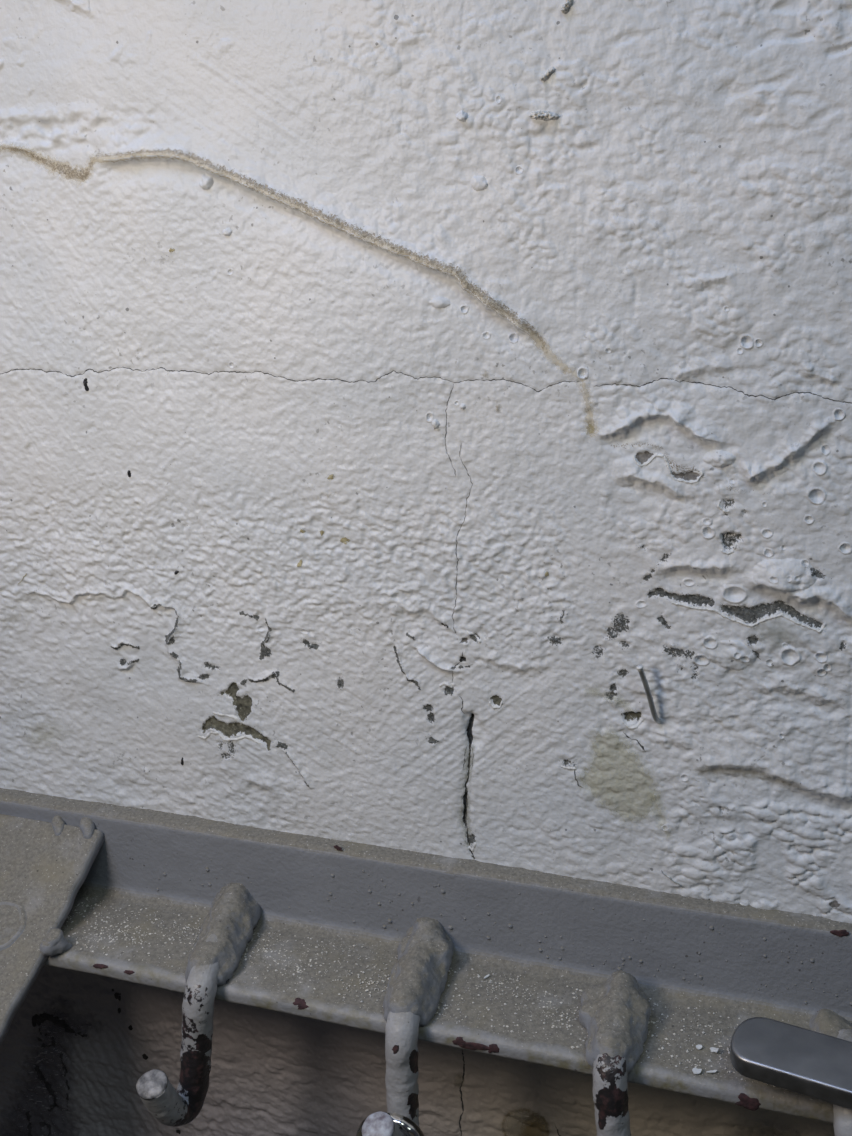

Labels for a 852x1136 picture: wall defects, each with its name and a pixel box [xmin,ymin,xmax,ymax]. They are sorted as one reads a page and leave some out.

peeling [633,451,704,484]
peeling [717,499,747,555]
crack [2,367,851,859]
peeling [592,612,630,658]
peeling [643,554,826,660]
peeling [20,582,315,789]
peeling [606,669,628,700]
peeling [663,645,699,679]
peeling [621,711,644,730]